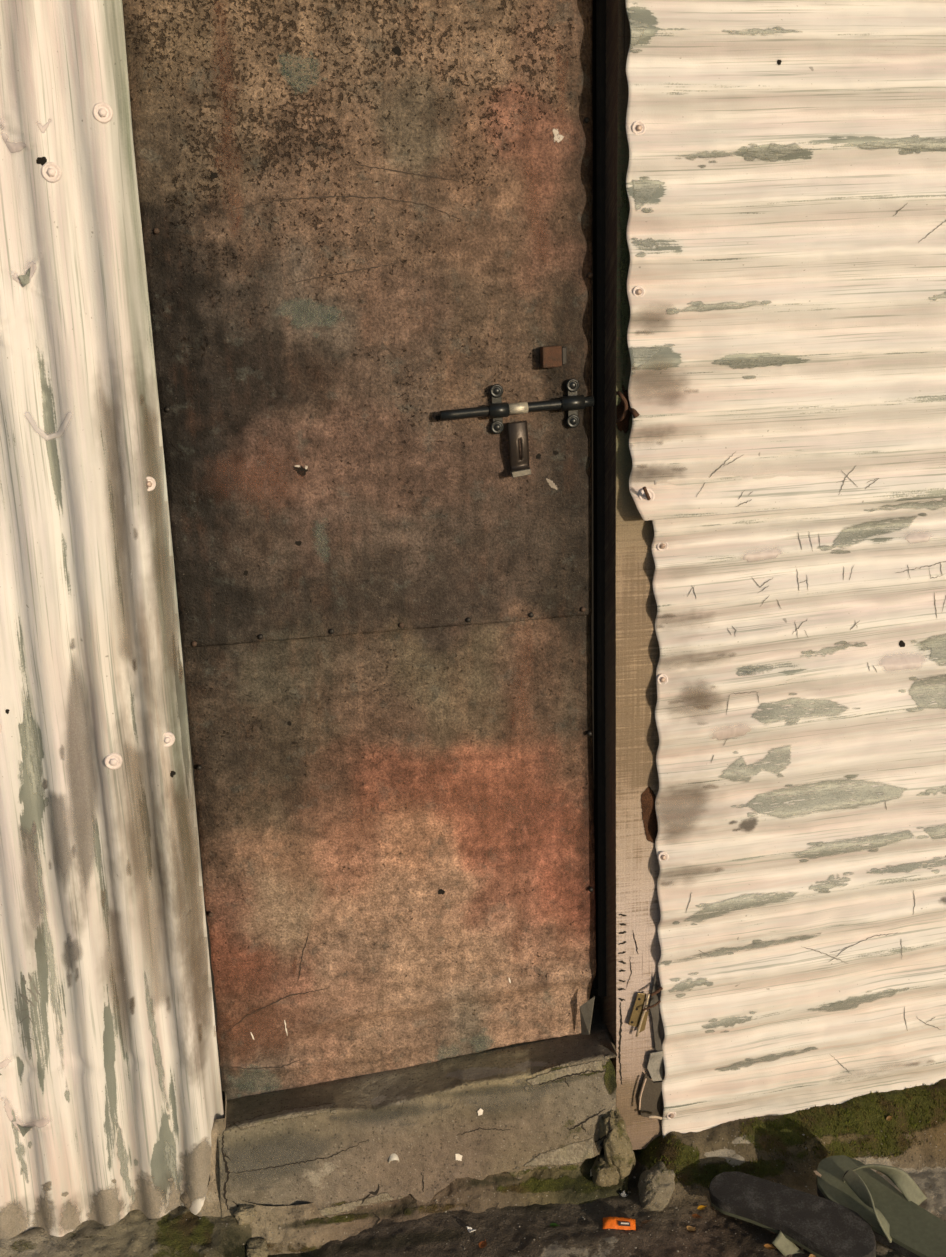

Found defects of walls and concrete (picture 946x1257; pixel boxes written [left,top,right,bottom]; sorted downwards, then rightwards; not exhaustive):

peeling [680,143,803,167]
corrosion [616,385,631,433]
peeling [819,498,946,554]
peeling [752,693,860,725]
peeling [720,745,946,818]
peeling [794,825,946,862]
peeling [867,857,946,874]
peeling [673,872,852,925]
peeling [661,933,819,998]
peeling [808,988,909,1012]
peeling [716,1047,816,1071]
crack [361,1184,380,1228]